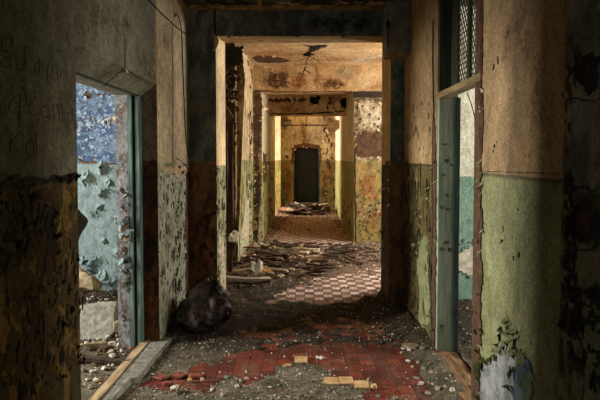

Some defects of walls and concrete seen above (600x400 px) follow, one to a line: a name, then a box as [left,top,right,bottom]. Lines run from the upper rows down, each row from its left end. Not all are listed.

peeling [0,87,129,238]
flaking render [169,167,227,310]
peeling [212,31,347,261]
flaking render [285,99,390,302]
peeling [402,112,449,349]
flaking render [459,0,534,400]